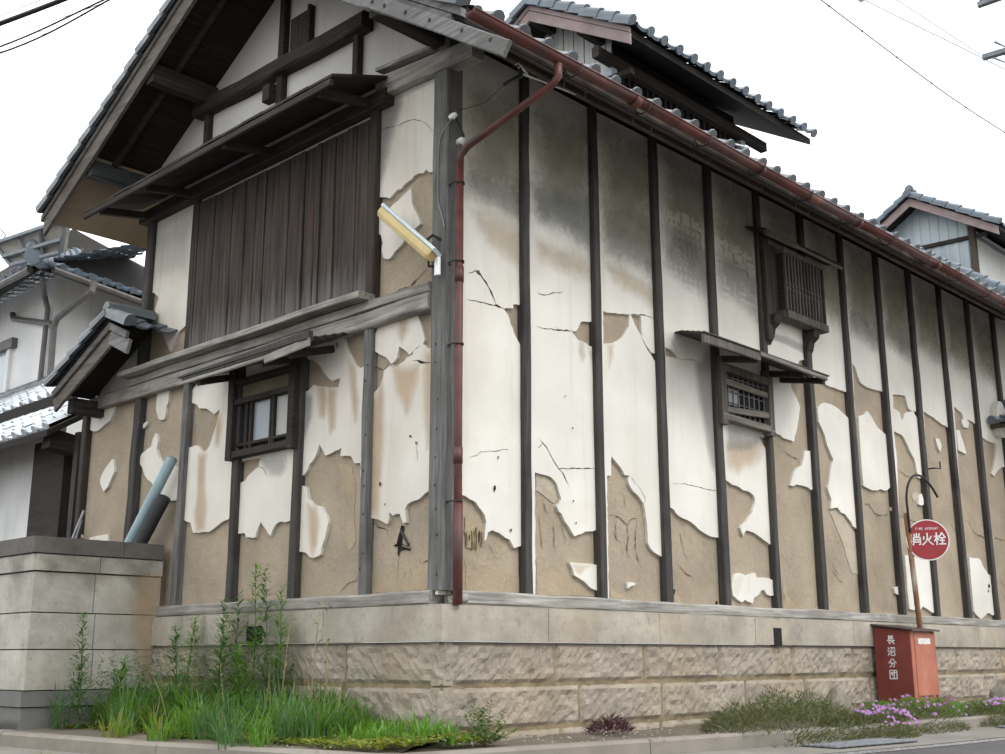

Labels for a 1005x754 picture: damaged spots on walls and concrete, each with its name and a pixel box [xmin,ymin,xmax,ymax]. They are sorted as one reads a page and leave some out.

crack [470,270,507,310]
damp [470,96,519,194]
damp [540,115,590,225]
damp [606,140,651,246]
damp [719,188,754,284]
damp [813,232,995,378]
flaking render [83,384,290,607]
flaking render [300,448,361,598]
crack [538,439,594,486]
flaking render [535,460,661,602]
flaking render [670,509,719,605]
flaking render [726,369,1005,620]